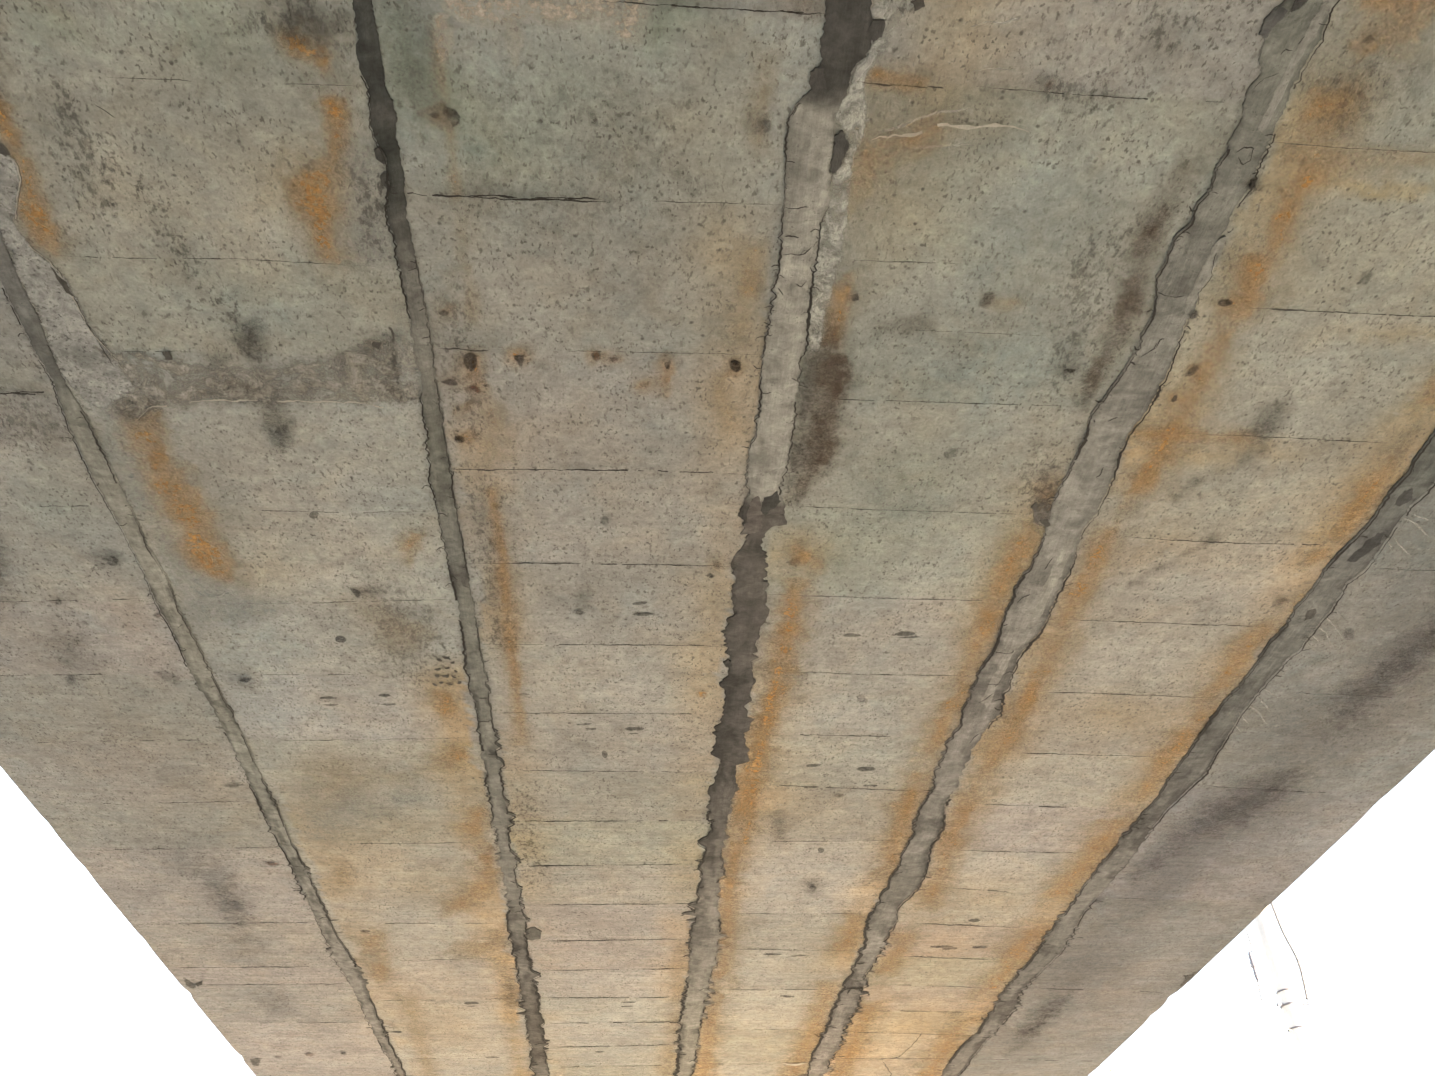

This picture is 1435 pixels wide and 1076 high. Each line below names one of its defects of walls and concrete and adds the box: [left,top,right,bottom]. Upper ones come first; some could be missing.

crack [605,1,825,15]
spalling [808,0,925,351]
crack [1255,0,1340,89]
crack [0,288,406,1075]
crack [360,76,829,1076]
crack [807,134,1276,1076]
crack [938,434,1435,1076]